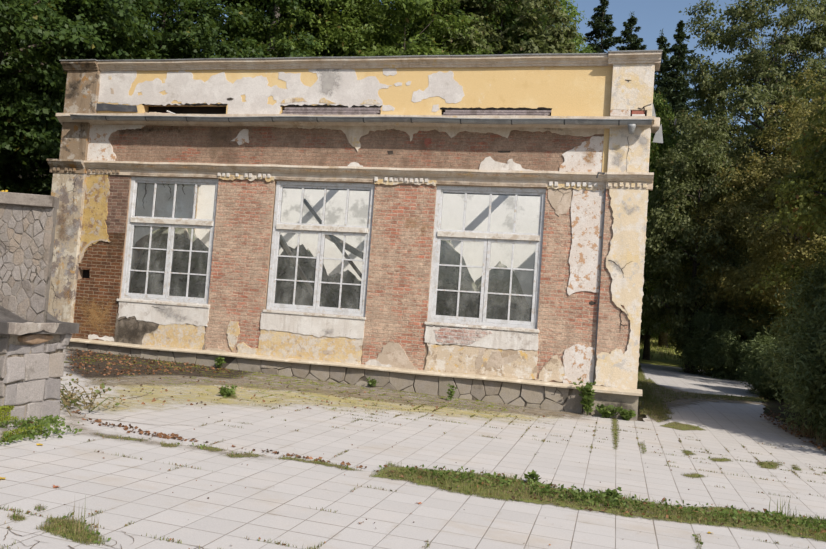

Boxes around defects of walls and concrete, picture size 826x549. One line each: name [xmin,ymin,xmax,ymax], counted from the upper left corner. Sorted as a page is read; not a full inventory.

peeling [98,68,552,114]
flaking render [108,125,604,172]
flaking render [8,175,599,384]
water stain [88,323,152,344]
water stain [64,349,250,379]